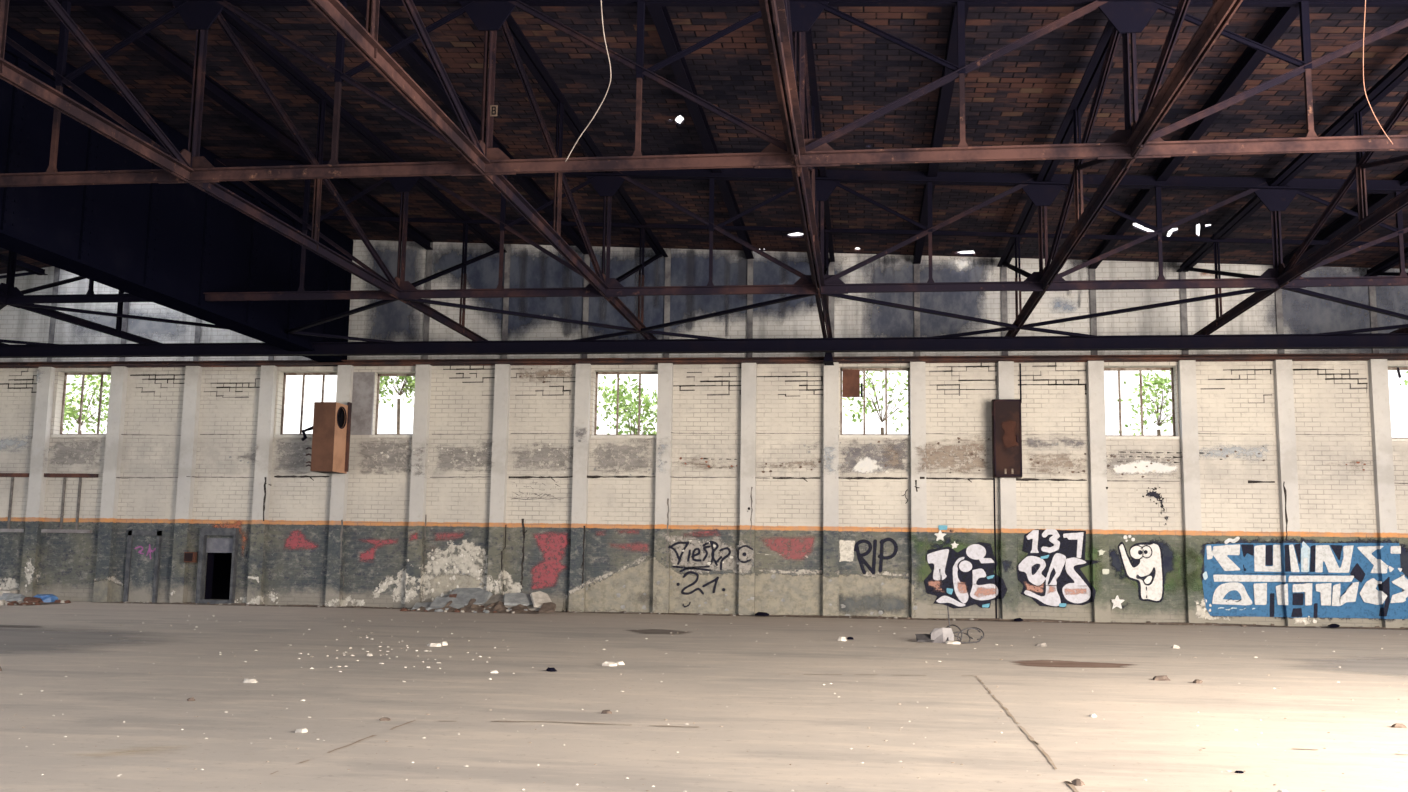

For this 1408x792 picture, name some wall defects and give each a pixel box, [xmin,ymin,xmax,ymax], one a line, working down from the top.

damp [366,244,822,341]
damp [865,257,992,337]
damp [1268,266,1408,353]
peeling [0,557,41,593]
peeling [325,540,522,607]
crack [961,675,1079,792]